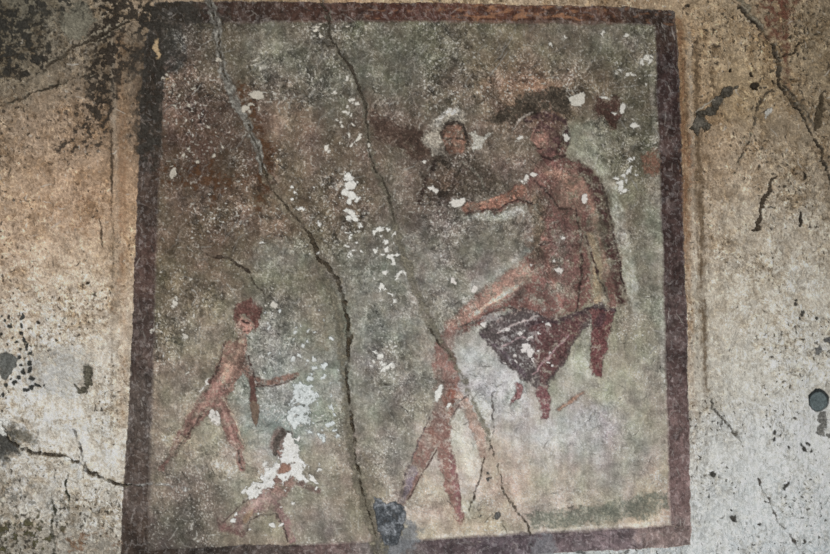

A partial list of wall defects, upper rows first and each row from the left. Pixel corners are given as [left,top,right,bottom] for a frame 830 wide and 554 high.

crack [0,21,130,104]
damp [0,0,224,192]
flaking render [689,86,738,136]
crack [732,0,830,180]
crack [205,0,389,554]
peeling [339,172,363,258]
peeling [372,227,406,305]
crack [320,0,531,534]
peeling [241,325,340,500]
crack [3,425,187,554]
flaking render [373,497,419,554]